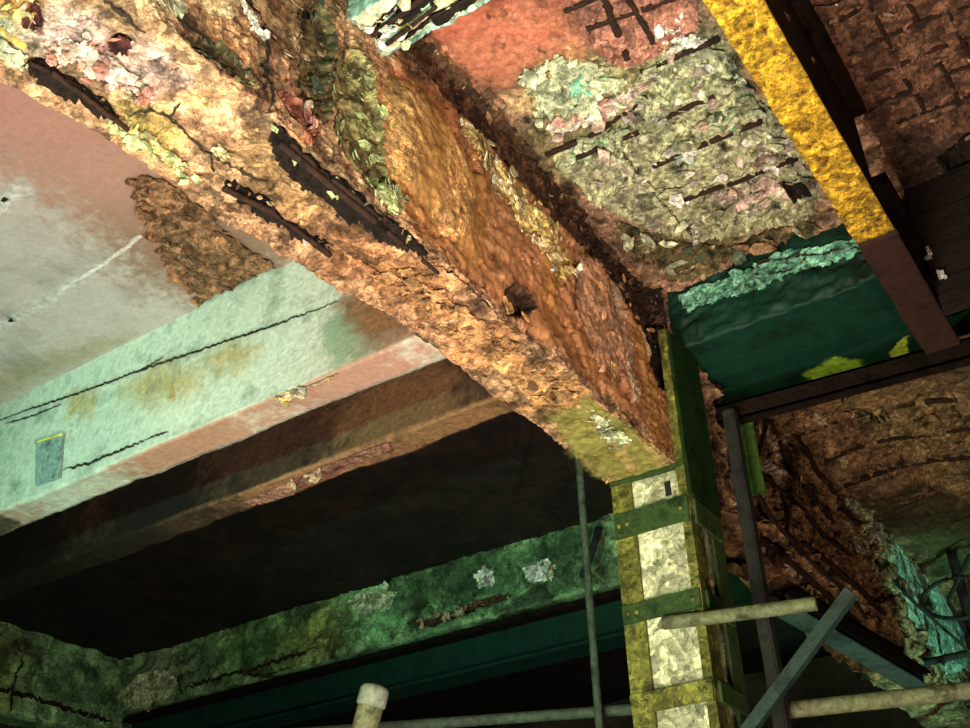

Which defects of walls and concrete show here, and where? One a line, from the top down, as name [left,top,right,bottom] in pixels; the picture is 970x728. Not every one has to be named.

rust [433,1,583,80]
spalling [0,1,274,308]
spalling [222,0,440,275]
rust [410,86,447,225]
rust [462,172,492,274]
spalling [363,0,861,392]
crack [0,301,338,424]
rust [635,321,666,444]
crack [63,432,166,471]
peeling [242,442,392,505]
spalling [752,390,970,616]
crack [0,655,112,724]